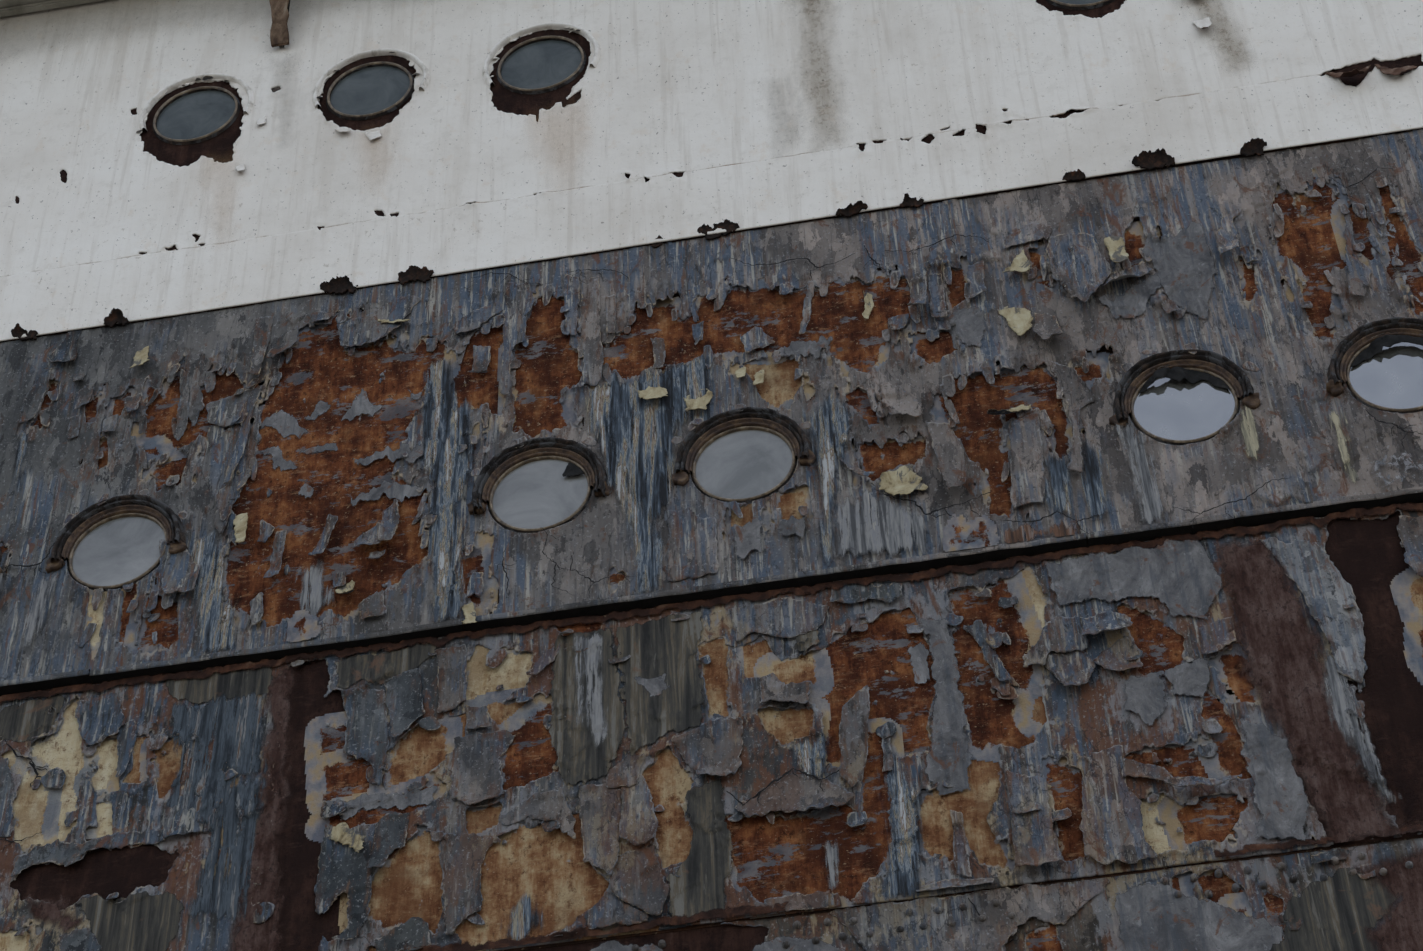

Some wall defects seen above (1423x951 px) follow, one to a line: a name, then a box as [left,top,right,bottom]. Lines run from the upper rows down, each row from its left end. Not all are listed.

corrosion [136,75,244,167]
corrosion [490,27,591,116]
corrosion [1240,138,1267,158]
corrosion [697,219,740,240]
peeling [1002,223,1153,303]
corrosion [1236,170,1423,343]
corrosion [0,257,1423,951]
peeling [963,566,1143,687]
peeling [1259,537,1366,683]
peeling [0,692,219,877]
peeling [314,753,670,951]
peeling [764,745,1242,951]